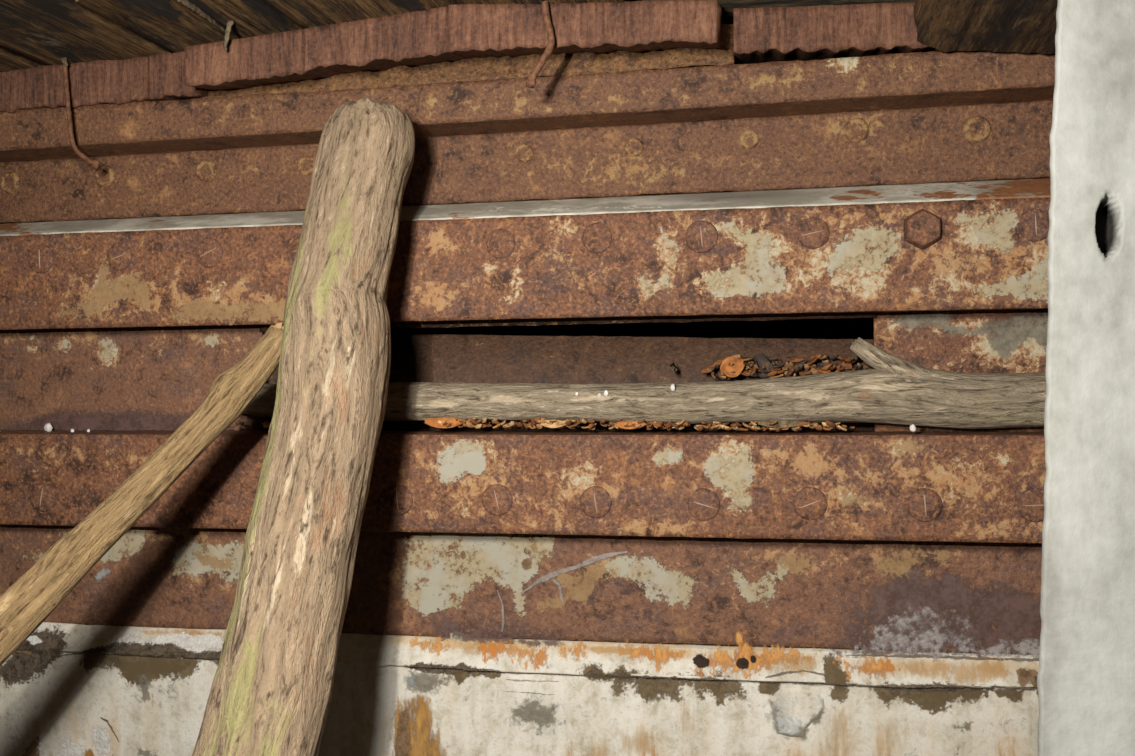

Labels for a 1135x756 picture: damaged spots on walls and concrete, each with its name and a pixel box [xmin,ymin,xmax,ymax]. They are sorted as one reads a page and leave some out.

corrosion [201,24,736,98]
water stain [79,630,223,702]
corrosion [410,637,443,655]
corrosion [464,640,685,671]
water stain [583,664,780,706]
corrosion [695,632,812,678]
water stain [823,655,850,704]
water stain [868,682,1038,715]
corrosion [394,695,440,756]